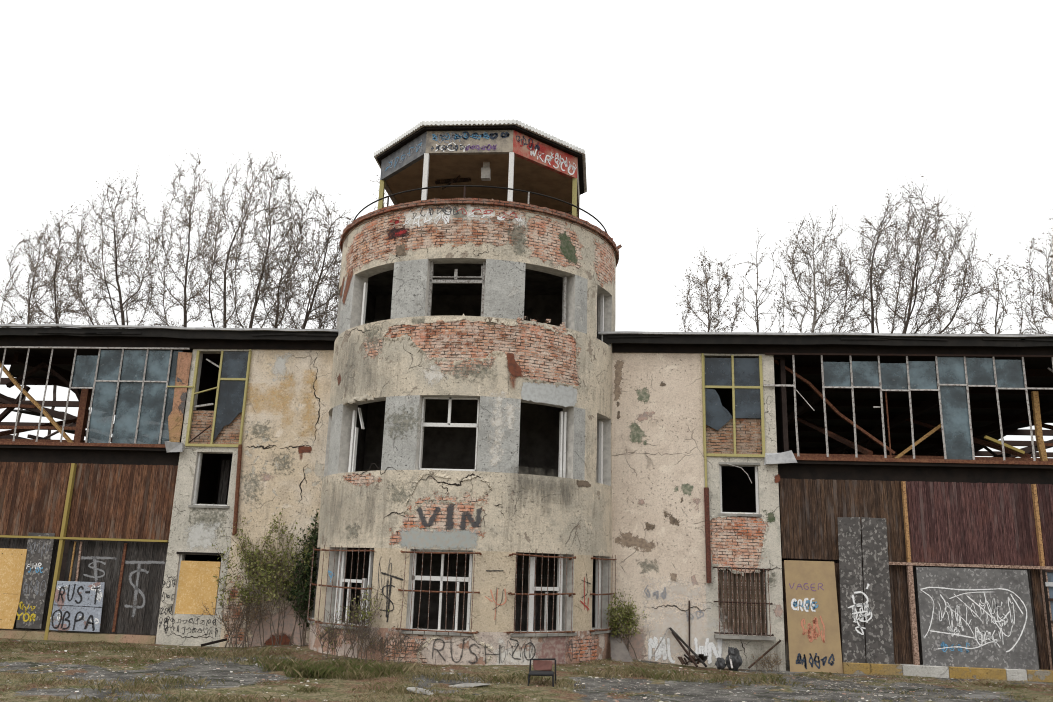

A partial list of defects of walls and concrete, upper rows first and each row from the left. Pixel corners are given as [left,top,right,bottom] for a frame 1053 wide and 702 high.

flaking render [345,197,615,287]
flaking render [363,313,581,390]
crack [247,353,320,501]
peeling [488,391,515,467]
spalling [613,360,625,419]
peeling [630,387,659,445]
peeling [389,469,492,545]
crack [421,473,504,526]
peeling [674,484,694,503]
peeling [613,512,680,583]
peeling [704,512,770,576]